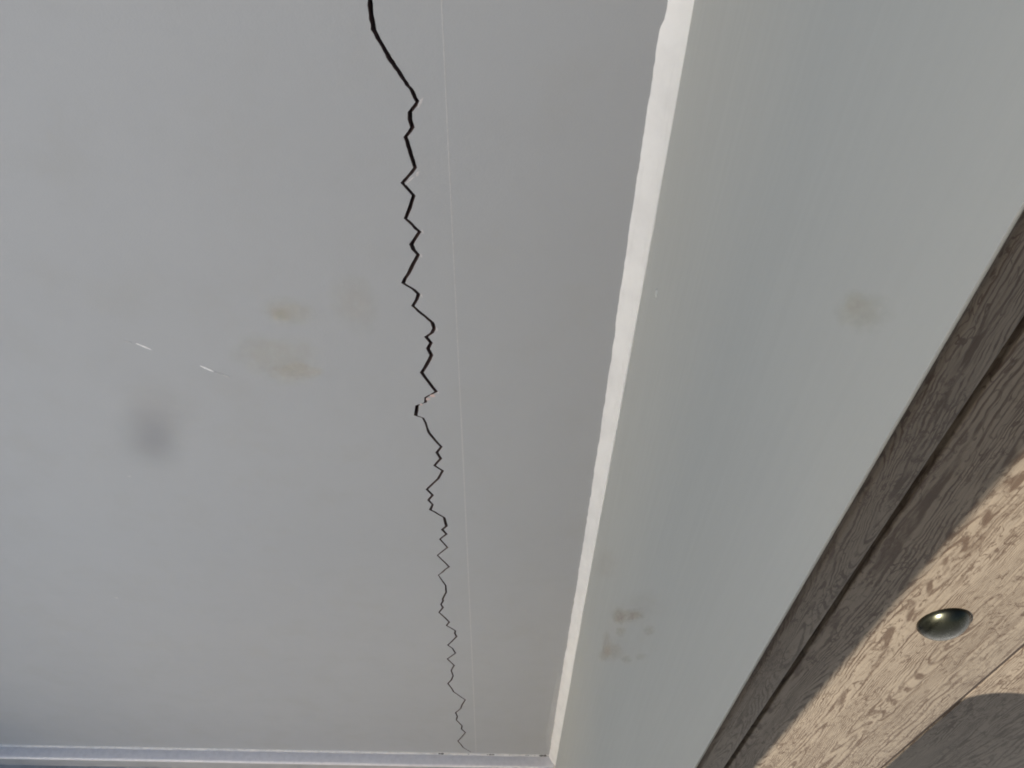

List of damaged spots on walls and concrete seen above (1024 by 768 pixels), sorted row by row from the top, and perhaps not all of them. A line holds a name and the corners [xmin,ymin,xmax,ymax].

crack [367,0,469,751]